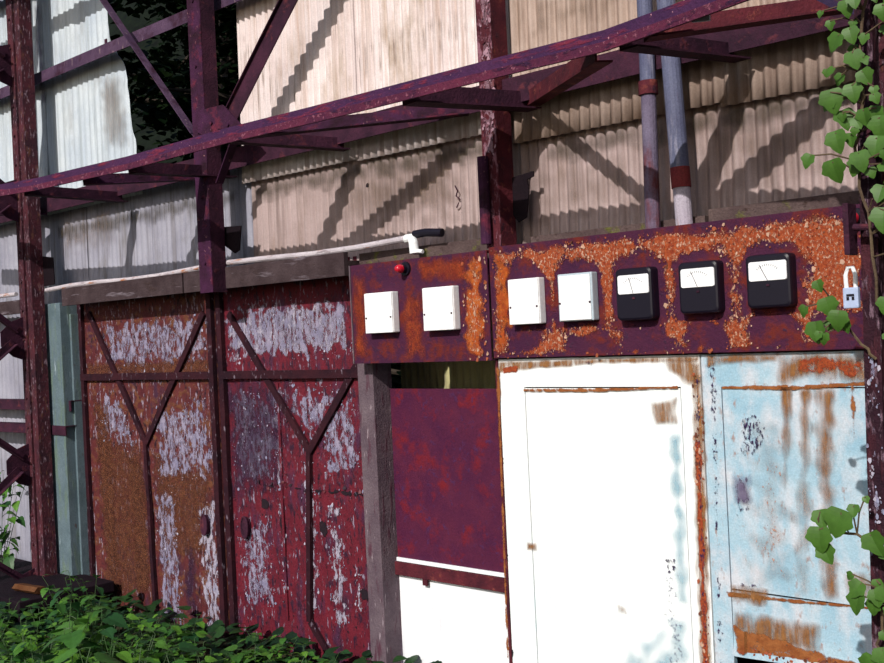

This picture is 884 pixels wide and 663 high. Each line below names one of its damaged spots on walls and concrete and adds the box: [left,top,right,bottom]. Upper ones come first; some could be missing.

peeling [102,310,207,373]
peeling [225,292,352,364]
rust [354,283,365,353]
peeling [97,390,137,452]
peeling [229,384,360,491]
rust [419,213,865,663]
rust [156,460,208,555]
peeling [155,392,212,625]
peeling [198,501,220,626]
peeling [237,499,289,609]
peeling [301,461,320,613]
peeling [328,503,363,631]